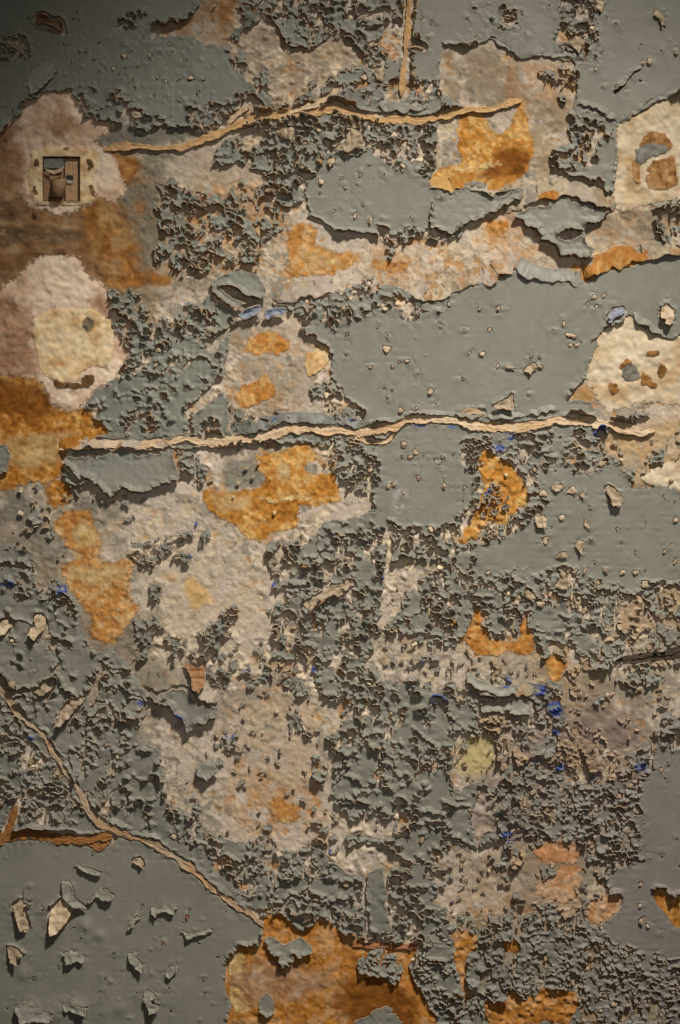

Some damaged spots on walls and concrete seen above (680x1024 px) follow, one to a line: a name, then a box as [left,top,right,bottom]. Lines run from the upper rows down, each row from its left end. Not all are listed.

crack [103,0,522,152]
corrosion [433,103,534,181]
peeling [0,0,680,522]
corrosion [284,222,408,279]
crack [59,407,656,452]
corrosion [0,373,140,645]
corrosion [202,442,341,542]
corrosion [458,449,529,544]
corrosion [461,608,535,656]
peeling [0,429,680,1024]
crack [0,684,265,928]
corrosion [224,913,437,1024]